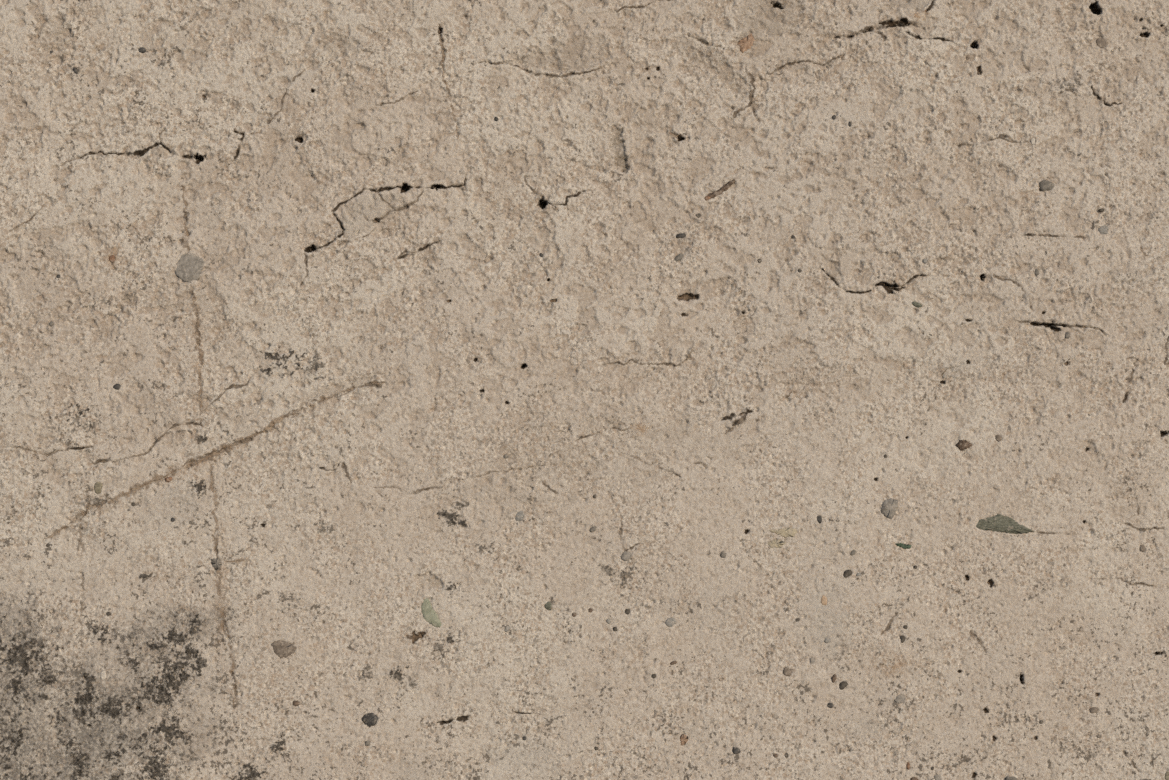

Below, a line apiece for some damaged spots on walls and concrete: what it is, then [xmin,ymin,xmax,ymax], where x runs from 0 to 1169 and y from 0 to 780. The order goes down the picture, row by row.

crack [733,0,952,118]
crack [63,73,302,251]
crack [301,176,466,285]
crack [822,268,929,294]
water stain [0,612,207,780]